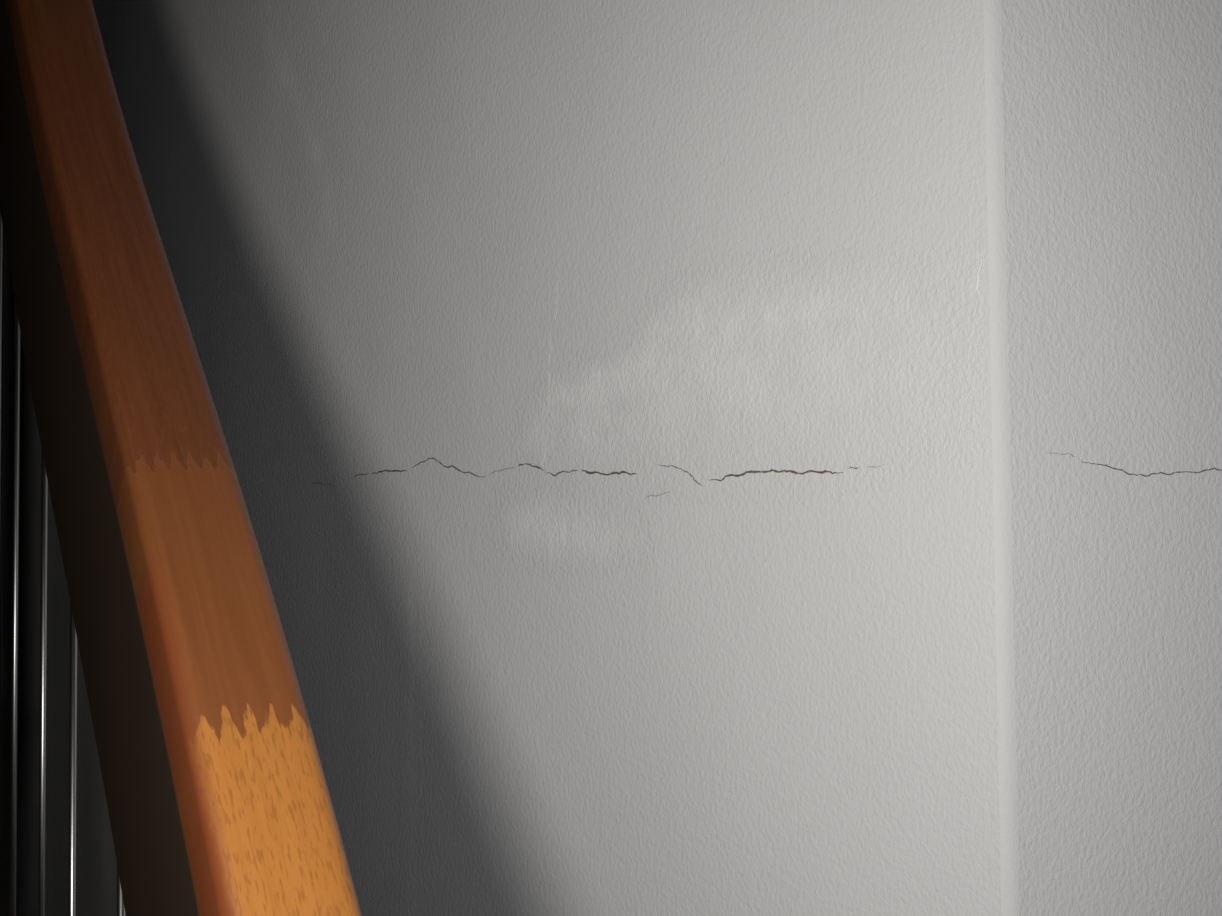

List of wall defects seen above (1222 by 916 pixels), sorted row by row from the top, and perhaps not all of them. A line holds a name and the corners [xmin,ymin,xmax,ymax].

crack [354,458,480,477]
crack [518,464,857,486]
crack [1081,461,1219,477]